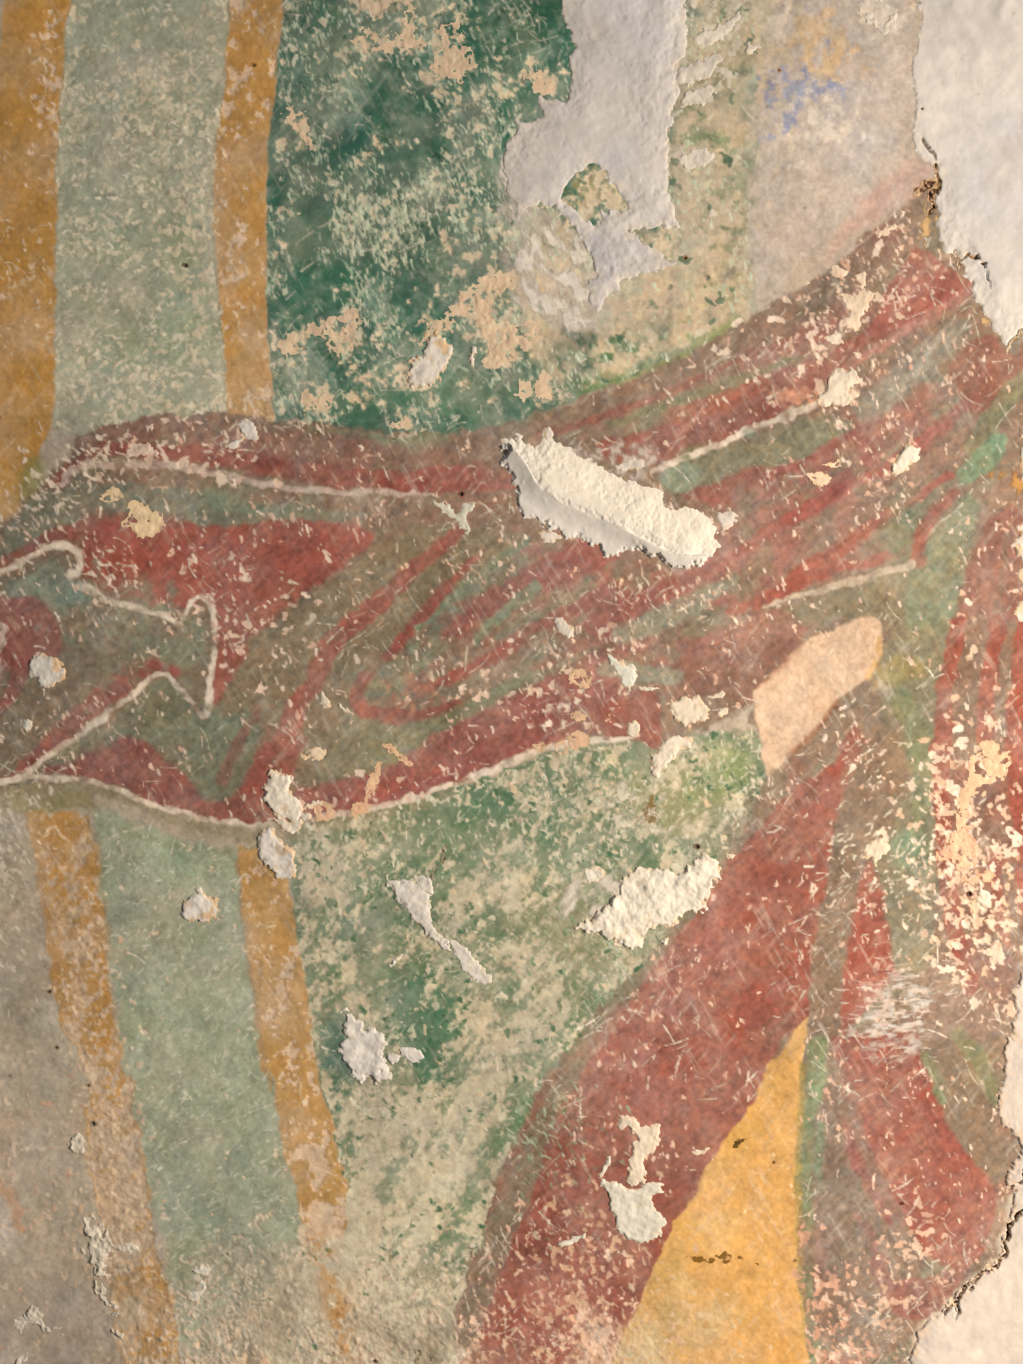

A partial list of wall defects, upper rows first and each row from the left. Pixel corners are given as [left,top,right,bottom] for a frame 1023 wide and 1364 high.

peeling [350,0,478,85]
flaking render [502,0,741,312]
flaking render [910,0,1023,345]
flaking render [877,223,898,238]
flaking render [823,265,875,344]
flaking render [816,367,861,407]
flaking render [256,743,413,880]
peeling [584,866,604,883]
peeling [380,1047,424,1080]
peeling [598,1156,611,1177]
flaking render [616,1114,661,1186]
crack [942,1168,1023,1315]